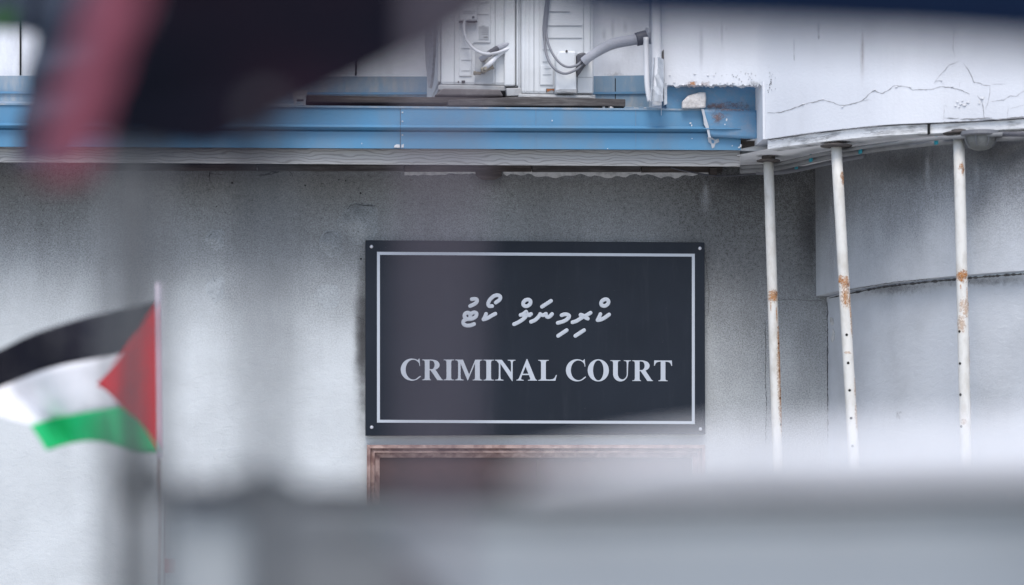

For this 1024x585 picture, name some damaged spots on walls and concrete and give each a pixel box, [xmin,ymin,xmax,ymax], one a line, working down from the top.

crack [768,50,1024,120]